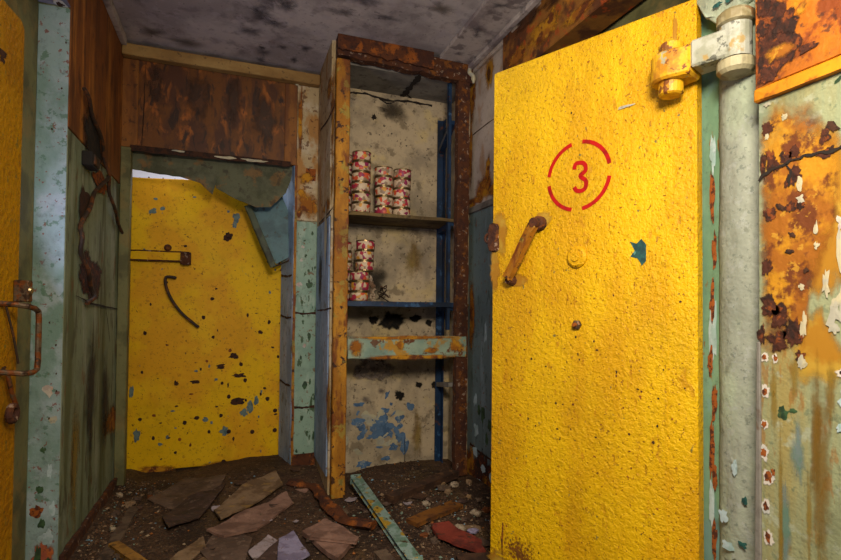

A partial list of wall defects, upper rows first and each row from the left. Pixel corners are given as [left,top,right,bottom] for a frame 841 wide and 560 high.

corrosion [485,59,494,88]
corrosion [754,0,841,107]
corrosion [469,83,494,208]
crack [758,145,841,186]
peeling [223,210,240,242]
peeling [822,215,841,334]
flaking render [353,359,394,381]
corrosion [349,285,475,359]
corrosion [756,109,841,560]
peeling [346,391,414,469]